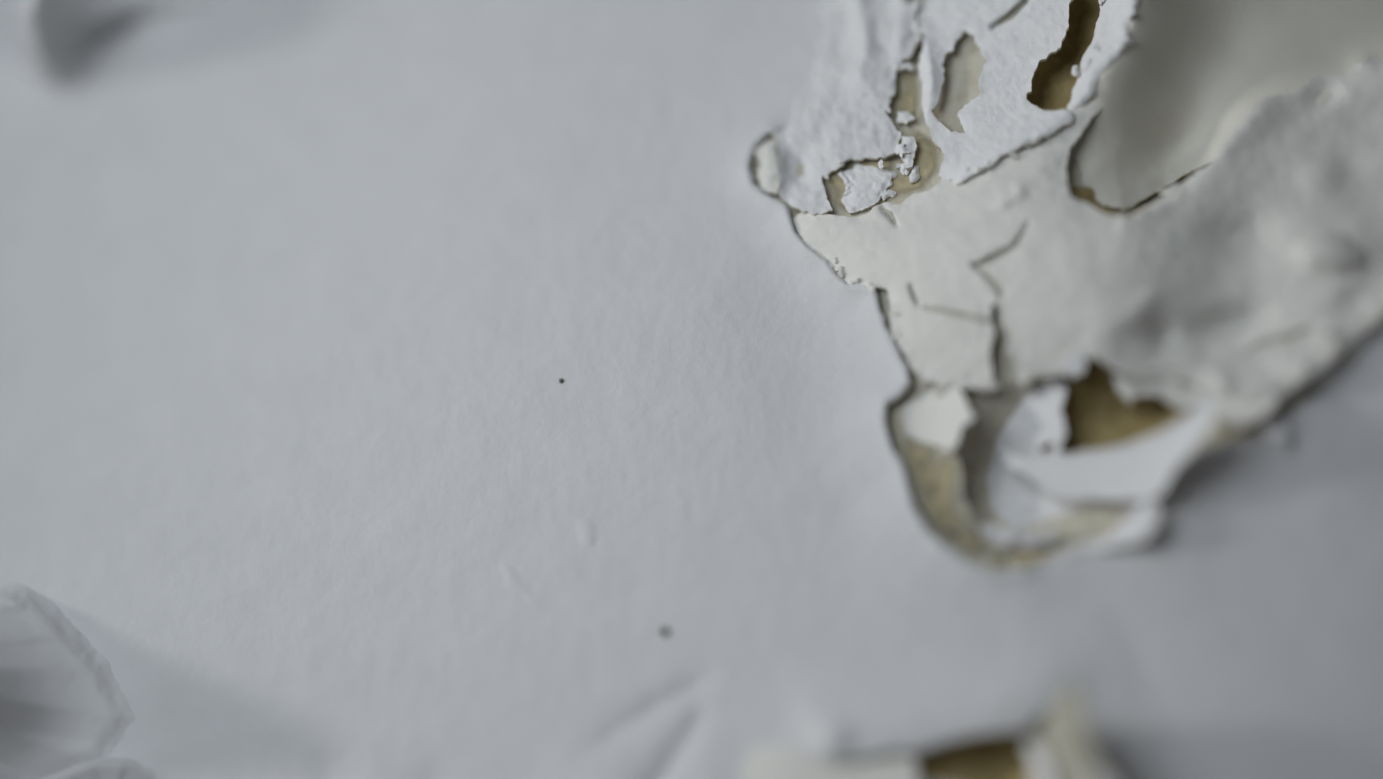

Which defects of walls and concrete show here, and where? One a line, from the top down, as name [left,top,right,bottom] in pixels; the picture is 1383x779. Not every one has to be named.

crack [993,0,1029,27]
crack [882,208,896,224]
peeling [751,0,1383,454]
crack [876,227,1027,378]
peeling [735,685,1108,779]